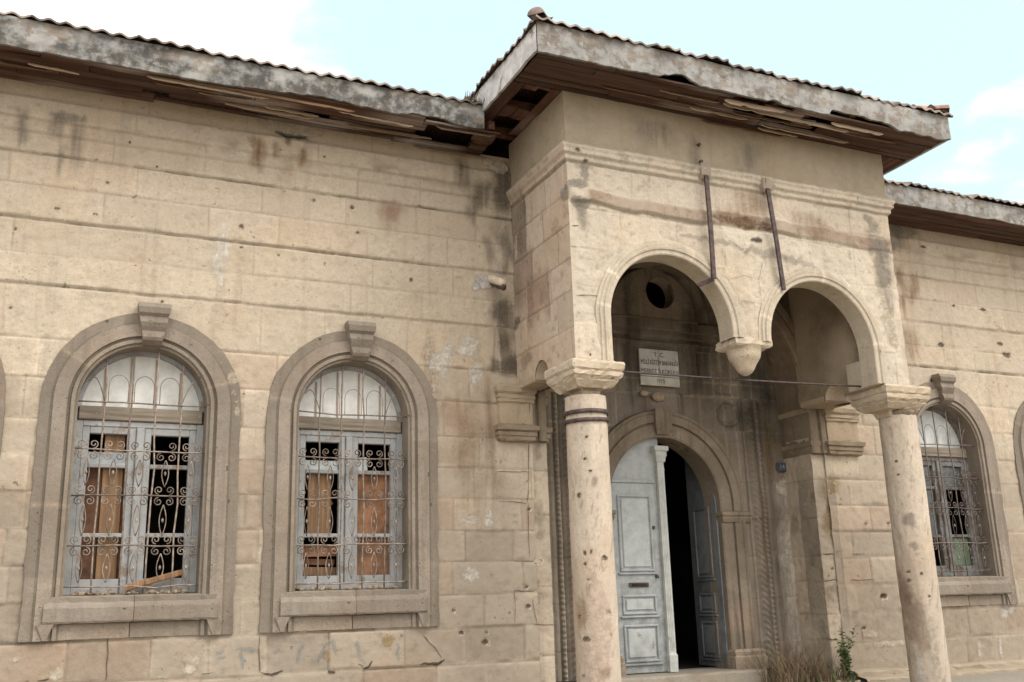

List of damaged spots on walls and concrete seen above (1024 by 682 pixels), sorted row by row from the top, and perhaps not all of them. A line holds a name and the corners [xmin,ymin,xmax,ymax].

leakage [276,131,306,139]
leakage [492,293,519,374]
peeling [423,336,482,400]